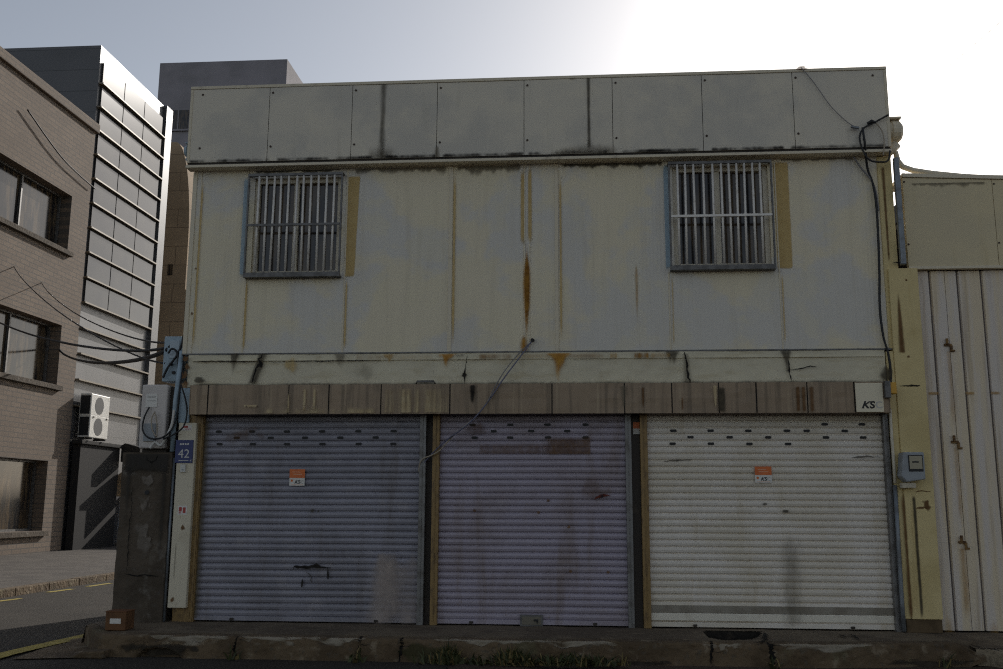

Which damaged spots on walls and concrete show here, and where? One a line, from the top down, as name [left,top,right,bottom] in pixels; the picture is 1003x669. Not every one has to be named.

leakage [346,118,539,159]
leakage [560,78,611,154]
rust [521,256,529,351]
rust [547,353,569,372]